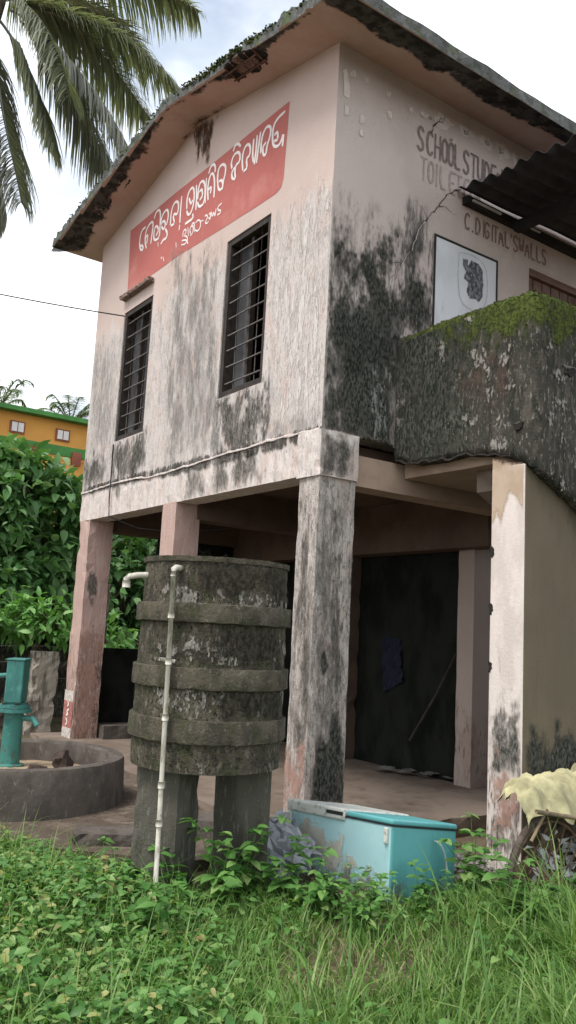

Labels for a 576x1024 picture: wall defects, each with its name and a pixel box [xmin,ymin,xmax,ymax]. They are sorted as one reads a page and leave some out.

spalling [222,47,268,82]
damp [254,13,310,52]
damp [51,71,231,252]
crack [385,189,462,292]
damp [83,430,160,495]
damp [185,380,270,497]
damp [322,199,473,475]
peeling [454,344,515,403]
peeling [549,365,576,448]
damp [176,535,344,803]
damp [492,703,576,776]